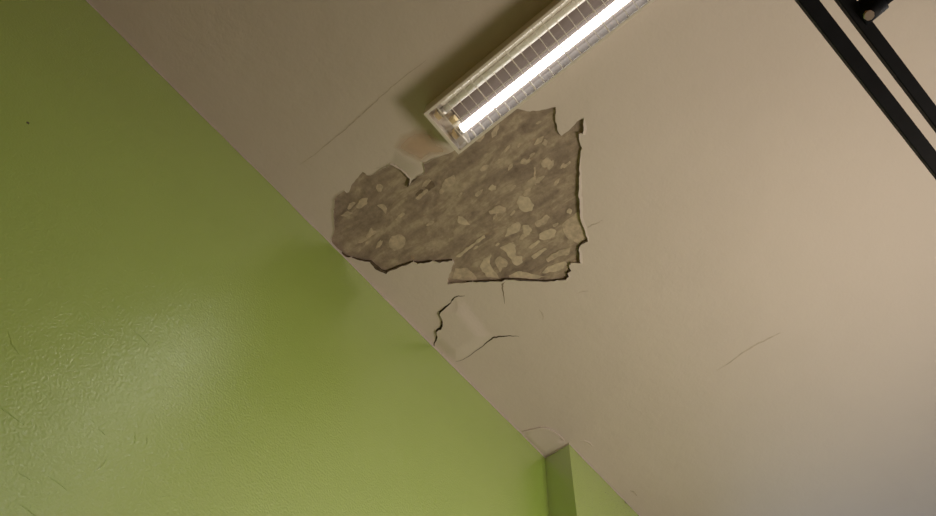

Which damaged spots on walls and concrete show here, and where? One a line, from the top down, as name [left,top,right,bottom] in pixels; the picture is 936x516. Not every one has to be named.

peeling [331,107,589,285]
crack [434,296,461,345]